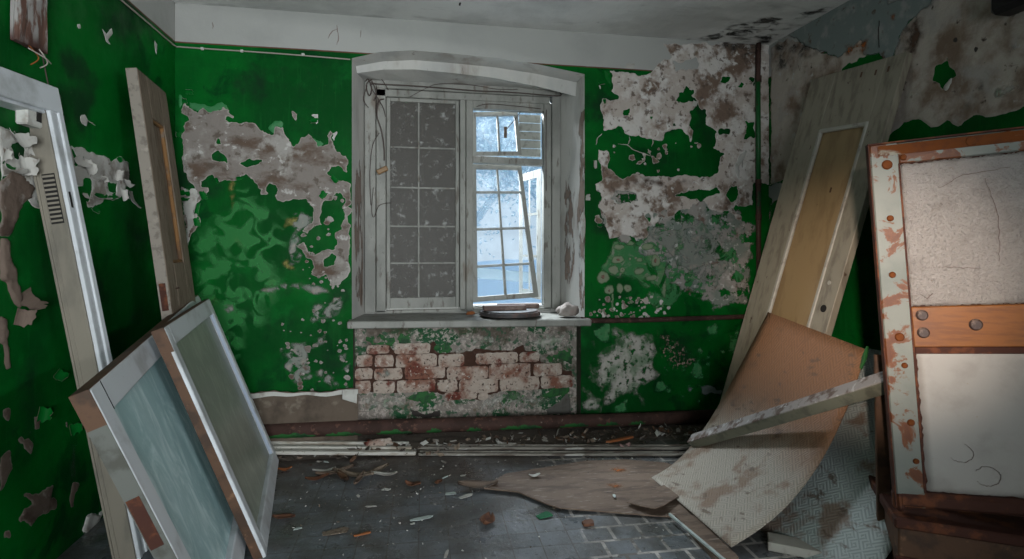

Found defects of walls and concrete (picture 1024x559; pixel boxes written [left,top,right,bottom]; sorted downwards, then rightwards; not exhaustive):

peeling [70,146,141,214]
peeling [176,89,363,306]
peeling [564,0,1024,311]
peeling [0,126,49,369]
peeling [594,323,610,341]
flaking render [355,341,573,418]
peeling [689,361,722,395]
peeling [0,406,53,491]
peeling [19,482,79,526]